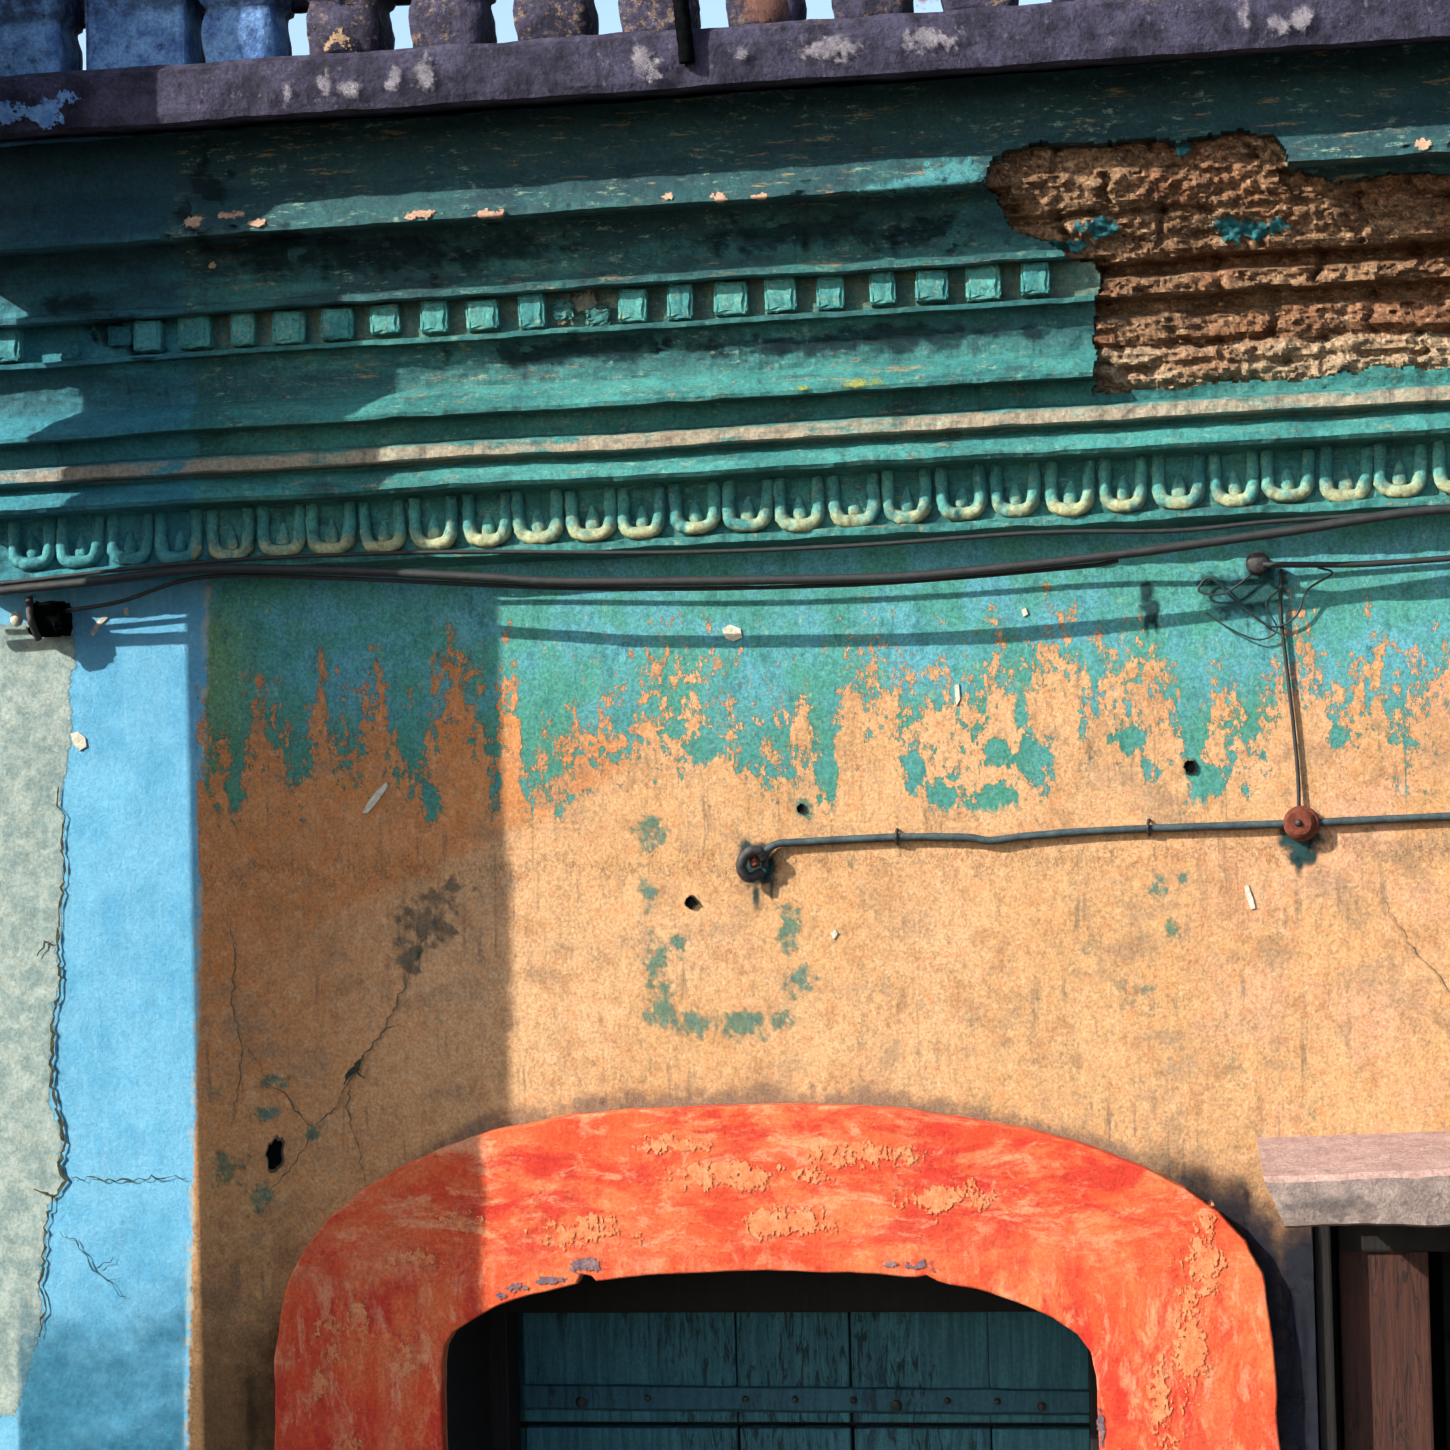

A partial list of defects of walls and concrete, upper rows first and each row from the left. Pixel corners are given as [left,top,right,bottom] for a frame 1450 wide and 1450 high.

peeling [0,89,81,131]
flaking render [845,130,1450,396]
peeling [195,575,1450,893]
crack [34,786,185,1337]
crack [225,906,446,1199]
damp [394,879,460,984]
peeling [1164,919,1182,937]
peeling [1244,885,1255,909]
damp [1166,1169,1319,1450]